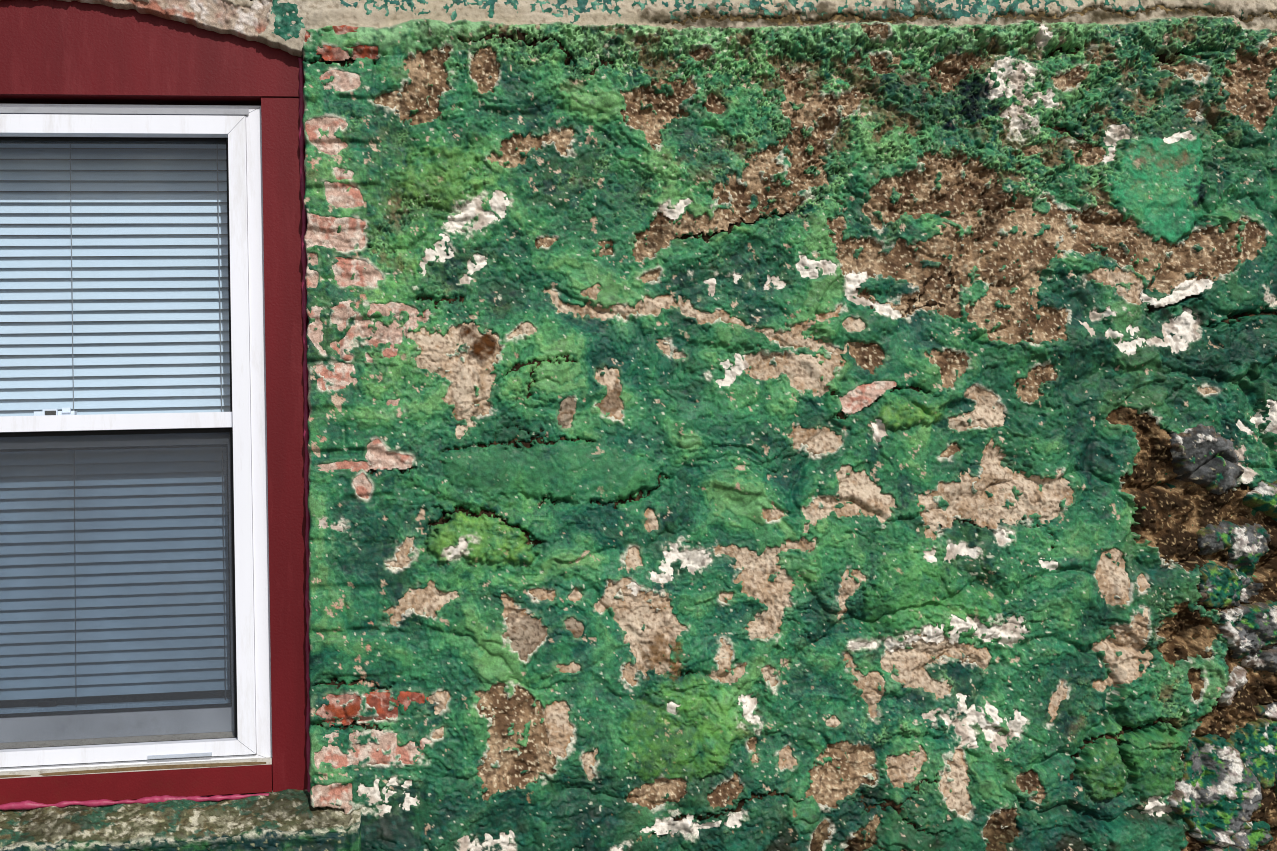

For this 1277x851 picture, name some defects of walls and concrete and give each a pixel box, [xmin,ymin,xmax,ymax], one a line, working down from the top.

flaking render [311,689,450,816]
crack [368,467,414,475]
peeling [304,117,537,439]
crack [415,296,464,309]
crack [428,497,557,547]
crack [443,354,593,452]
crack [590,473,670,509]
peeling [500,465,897,687]
spalling [543,50,1267,443]
peeling [843,613,1029,817]
peeling [915,349,1074,563]
spalling [1092,399,1277,851]